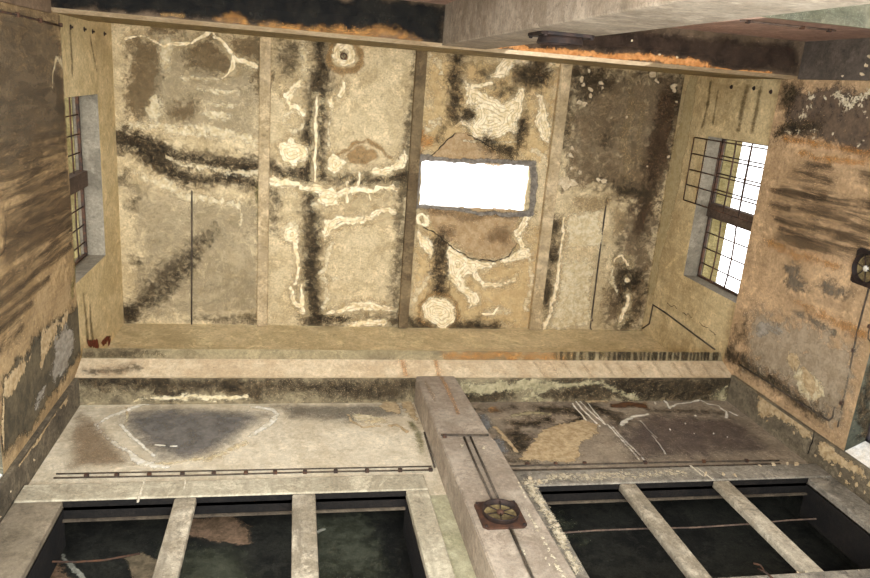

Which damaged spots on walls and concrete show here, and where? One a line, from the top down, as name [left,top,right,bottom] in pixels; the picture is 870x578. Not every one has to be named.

leakage [0,119,72,346]
leakage [123,27,260,151]
leakage [166,156,258,177]
leakage [269,39,412,327]
leakage [408,213,539,329]
leakage [422,53,560,167]
leakage [543,209,603,330]
leakage [563,68,697,324]
leakage [771,188,870,252]
peeling [1,305,111,468]
leakage [93,394,280,469]
leakage [555,310,854,428]